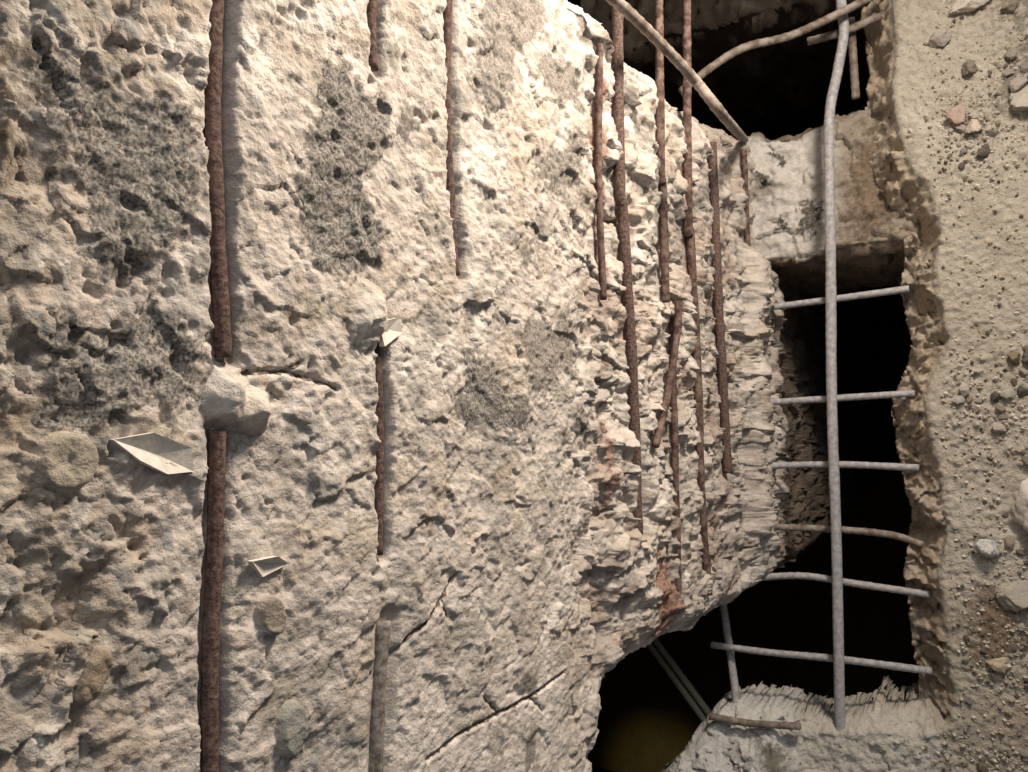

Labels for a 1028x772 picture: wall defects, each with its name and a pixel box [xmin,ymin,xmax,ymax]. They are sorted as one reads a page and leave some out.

spalling [467,0,549,124]
spalling [443,0,460,276]
corrosion [588,67,611,207]
spalling [509,220,547,275]
spalling [444,302,577,431]
spalling [523,0,932,731]
corrosion [596,405,622,504]
corrosion [644,547,685,638]
crack [426,671,564,759]
spalling [517,665,539,694]
spalling [518,718,540,772]
spalling [758,743,788,772]